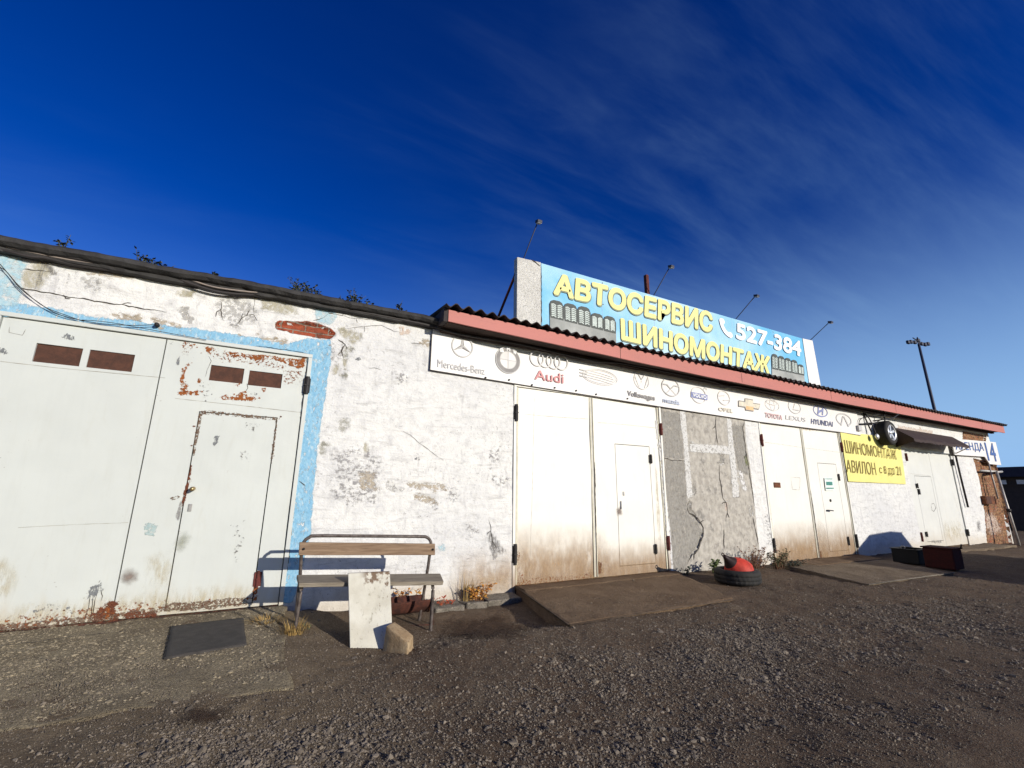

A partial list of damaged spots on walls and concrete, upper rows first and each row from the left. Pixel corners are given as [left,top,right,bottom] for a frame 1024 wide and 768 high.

flaking render [216,298,342,360]
rust [177,364,203,396]
rust [183,342,306,384]
rust [170,383,282,506]
peeling [331,449,455,505]
peeling [656,406,761,573]
crack [687,421,758,562]
rust [0,586,258,631]